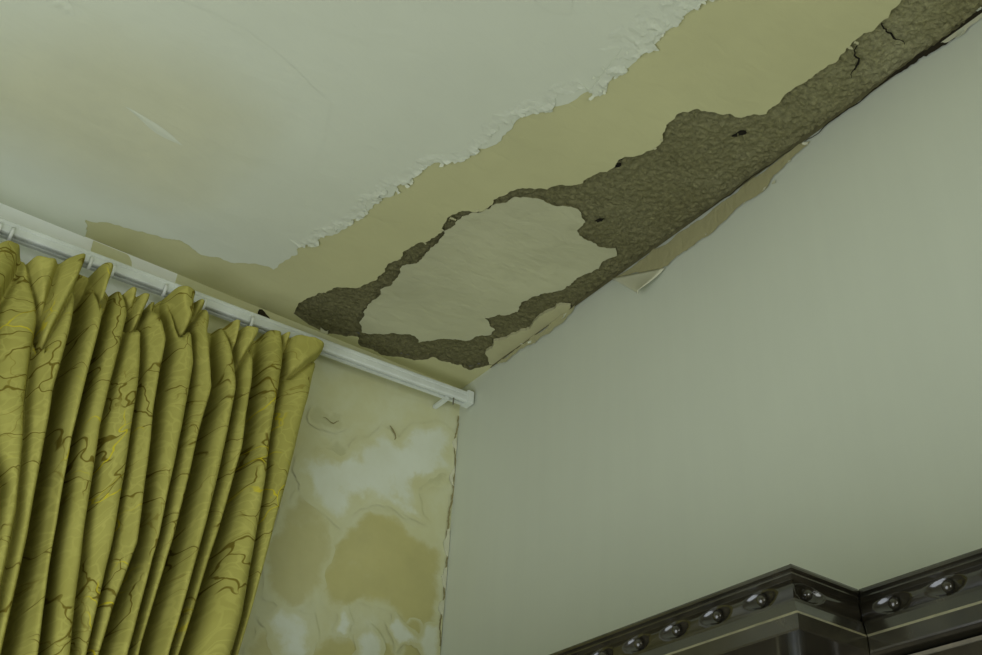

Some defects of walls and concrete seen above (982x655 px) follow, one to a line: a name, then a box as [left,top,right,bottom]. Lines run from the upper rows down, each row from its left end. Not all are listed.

peeling [85,0,982,389]
crack [570,8,982,309]
crack [490,323,551,368]
water stain [262,489,447,633]
water stain [313,630,356,655]